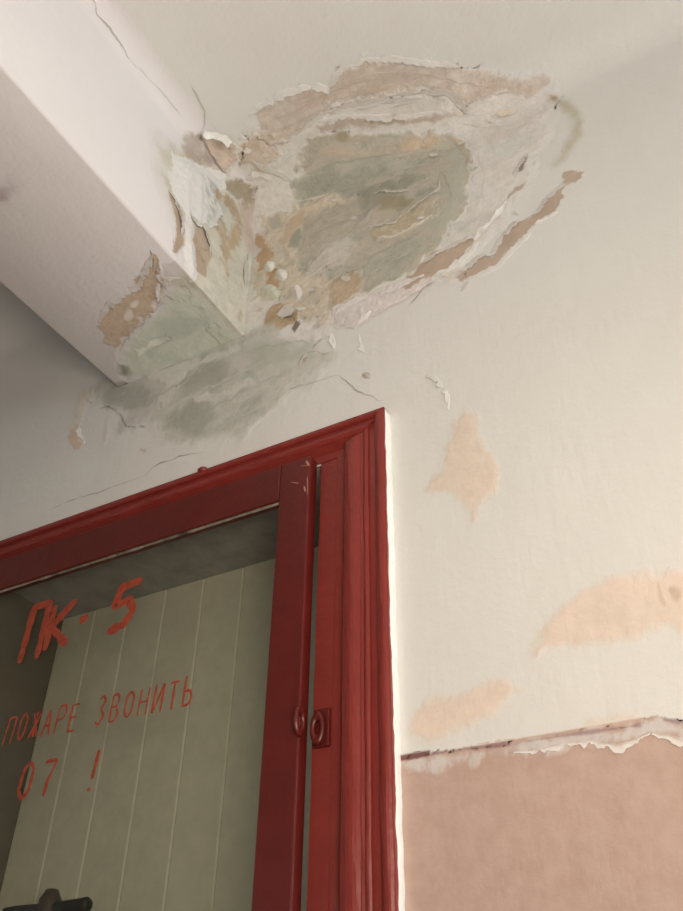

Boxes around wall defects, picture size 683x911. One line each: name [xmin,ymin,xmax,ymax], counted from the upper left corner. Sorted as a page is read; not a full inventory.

crack [93,0,205,137]
peeling [195,47,586,352]
peeling [95,250,180,351]
damp [87,283,347,455]
peeling [422,375,506,527]
peeling [527,564,683,661]
peeling [401,669,683,781]